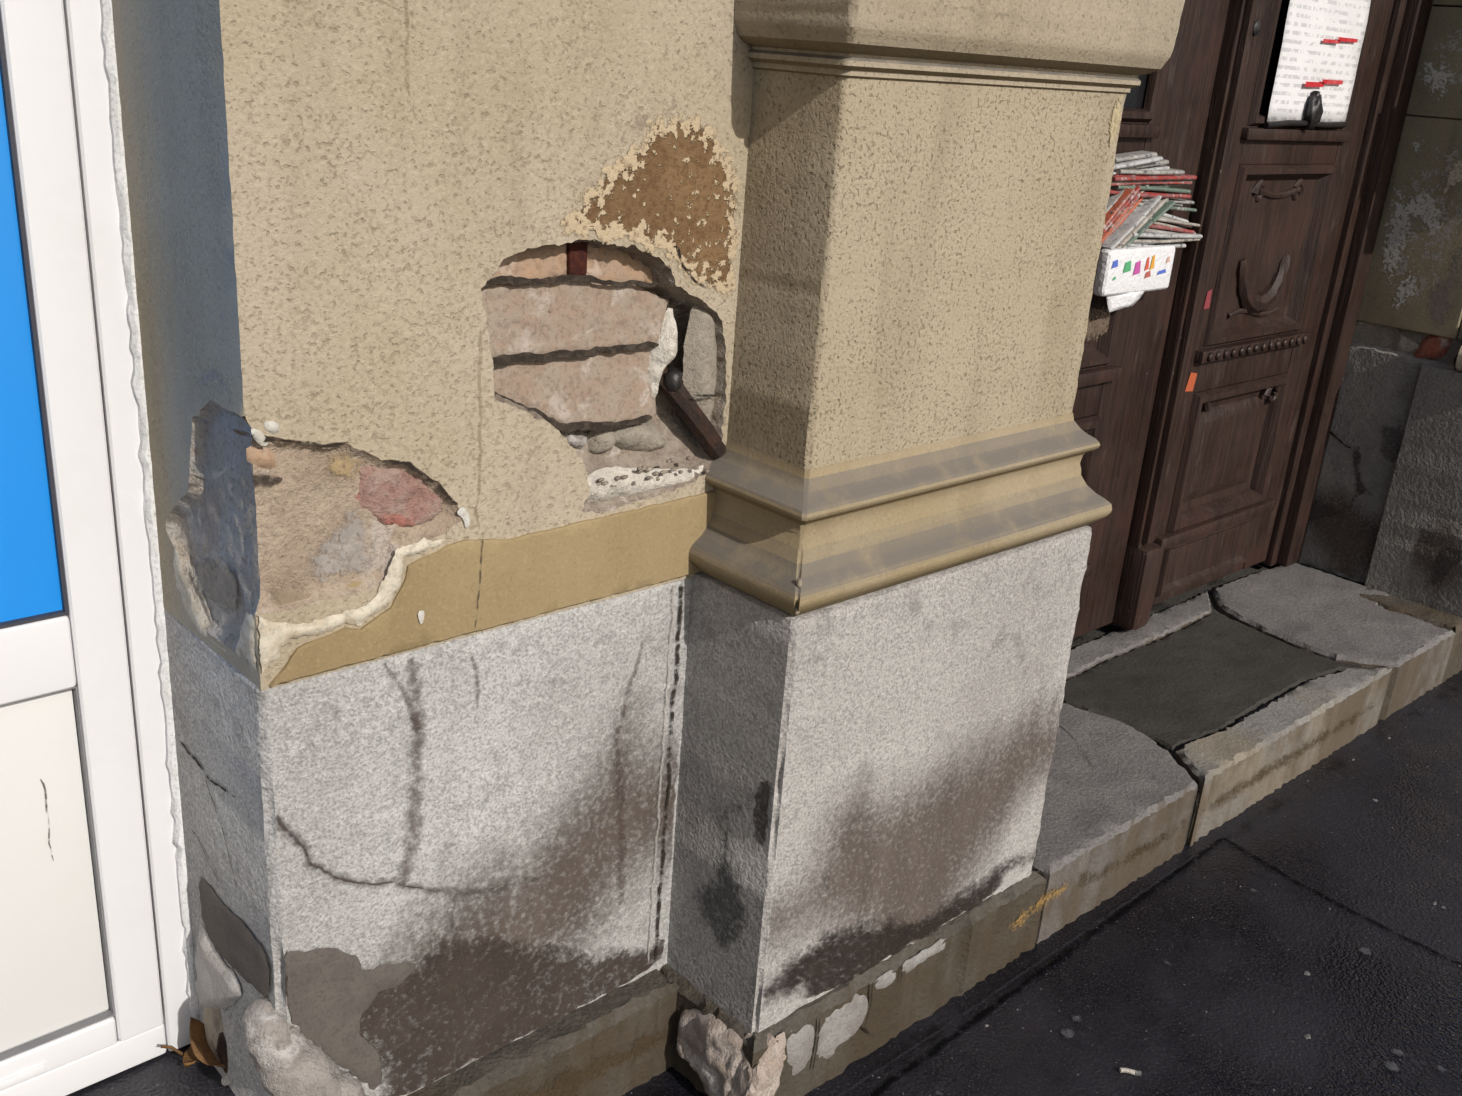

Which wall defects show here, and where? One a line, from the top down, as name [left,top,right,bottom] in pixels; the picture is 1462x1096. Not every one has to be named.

spalling [481,99,742,513]
spalling [165,400,470,674]
crack [278,815,433,891]
leakage [385,658,423,885]
leakage [359,712,678,1096]
crack [648,584,684,962]
leakage [697,804,745,948]
spalling [676,939,946,1096]
leakage [765,715,1058,1003]